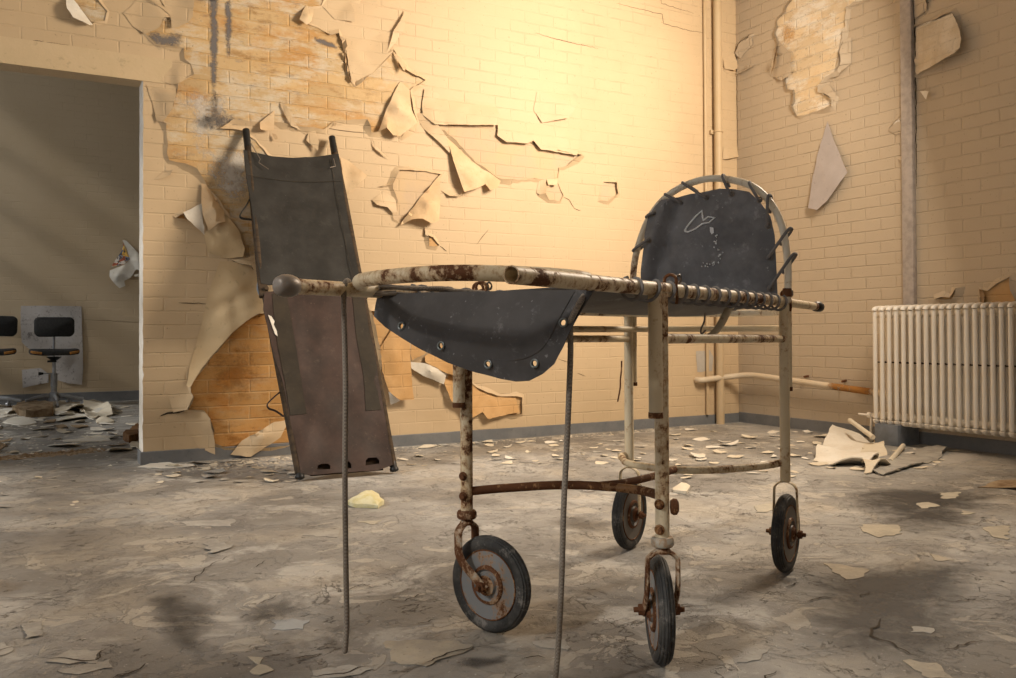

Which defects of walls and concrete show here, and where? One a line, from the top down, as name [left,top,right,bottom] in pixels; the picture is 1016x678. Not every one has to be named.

peeling [66,0,110,28]
leakage [148,33,180,46]
leakage [210,0,232,83]
peeling [913,0,963,78]
leakage [191,96,232,137]
peeling [765,0,870,210]
leakage [211,153,245,198]
peeling [123,0,585,483]